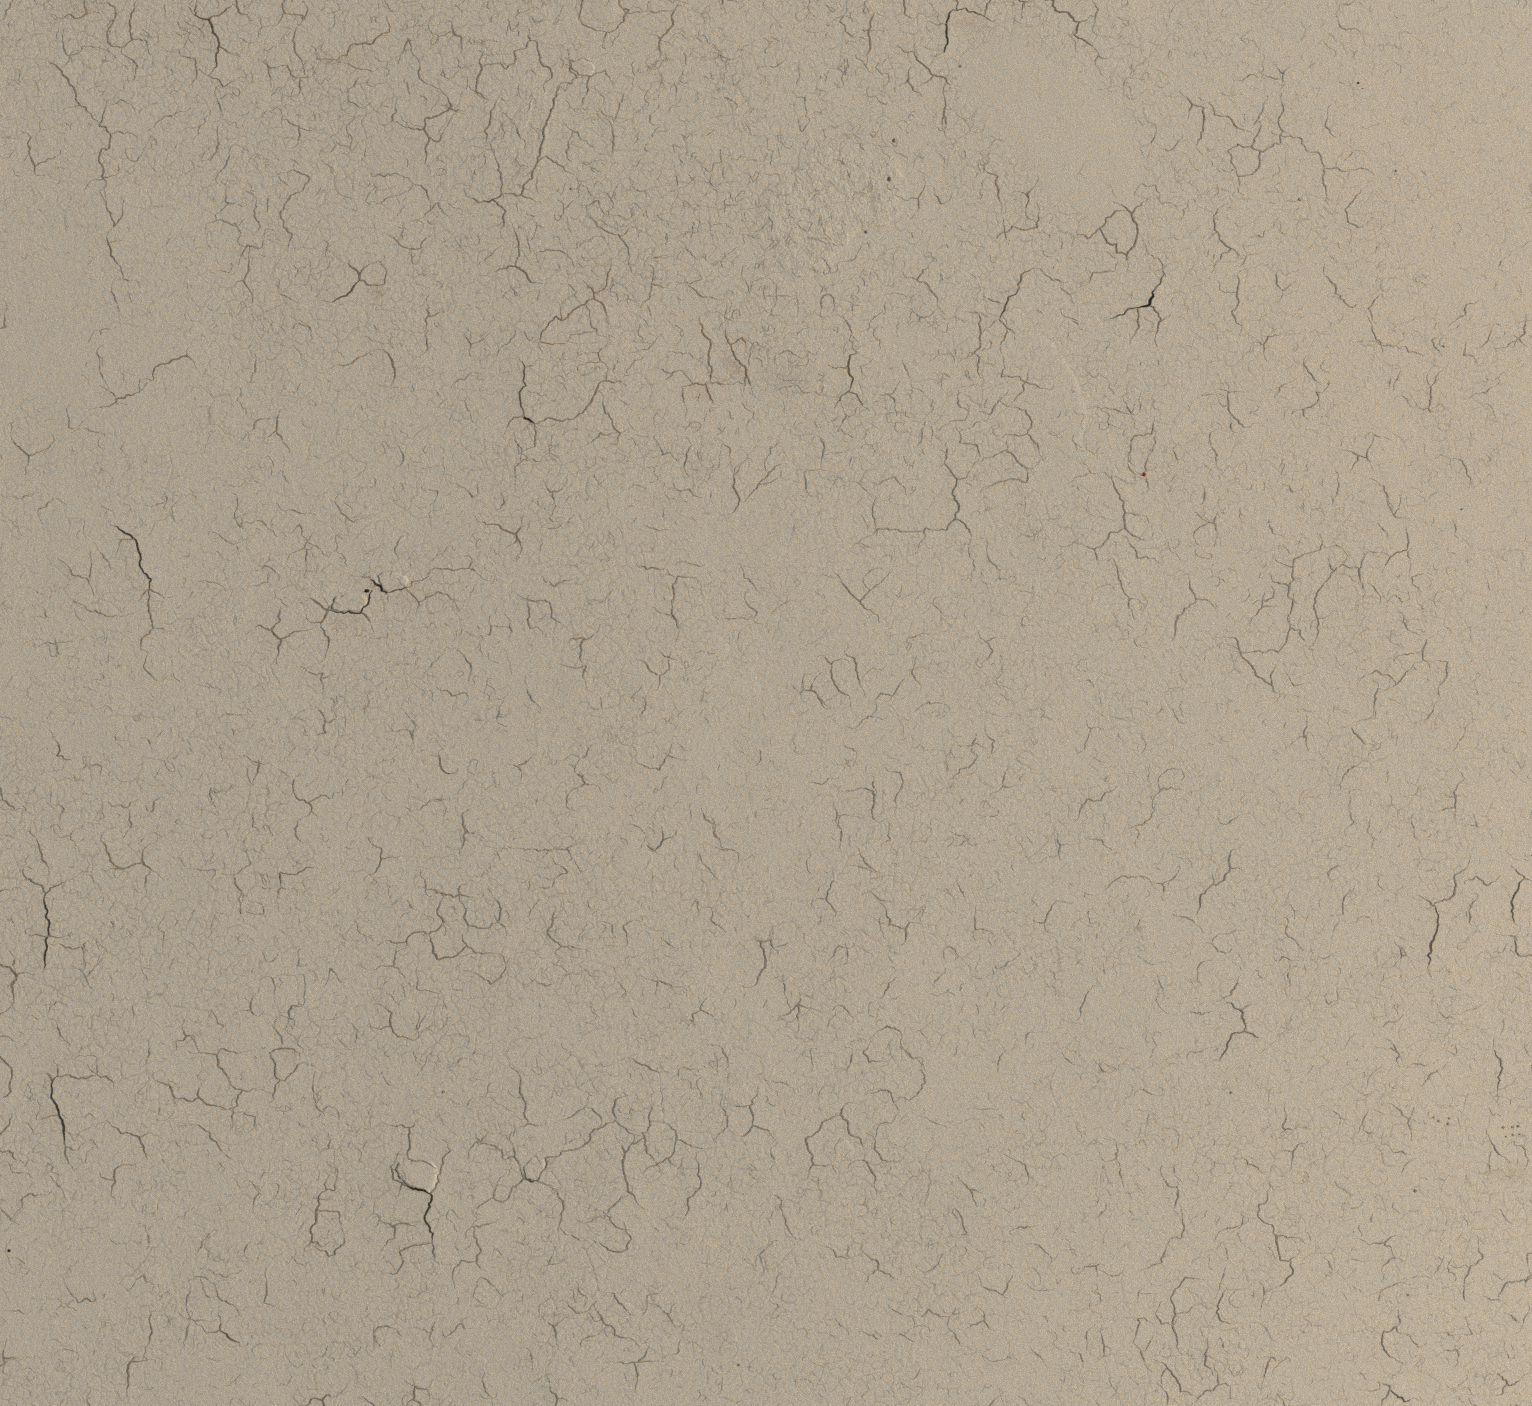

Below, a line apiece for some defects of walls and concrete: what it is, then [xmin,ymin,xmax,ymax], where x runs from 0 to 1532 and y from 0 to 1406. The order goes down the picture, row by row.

crack [759,0,789,83]
crack [1301,1,1424,84]
crack [13,492,65,531]
crack [33,444,229,713]
crack [716,530,800,676]
crack [689,806,755,863]
crack [741,432,1532,1406]